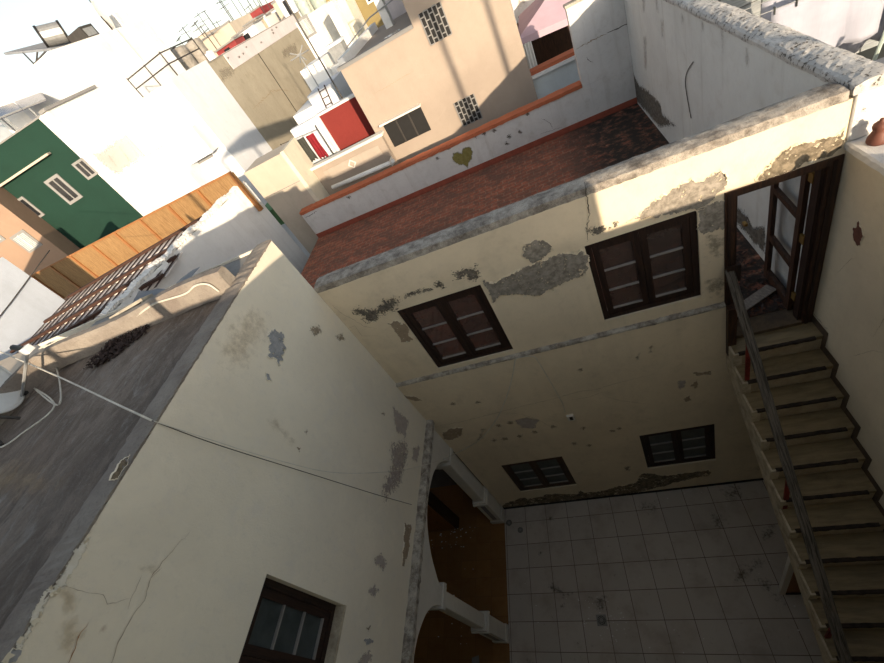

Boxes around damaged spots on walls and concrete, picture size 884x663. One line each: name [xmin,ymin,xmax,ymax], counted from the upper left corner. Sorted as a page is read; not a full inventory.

peeling [754,127,847,182]
peeling [587,169,730,235]
peeling [451,239,590,303]
peeling [352,281,445,343]
peeling [266,328,287,366]
peeling [381,407,420,502]
spalling [501,467,712,508]
peeling [2,537,91,663]
crack [49,533,189,663]